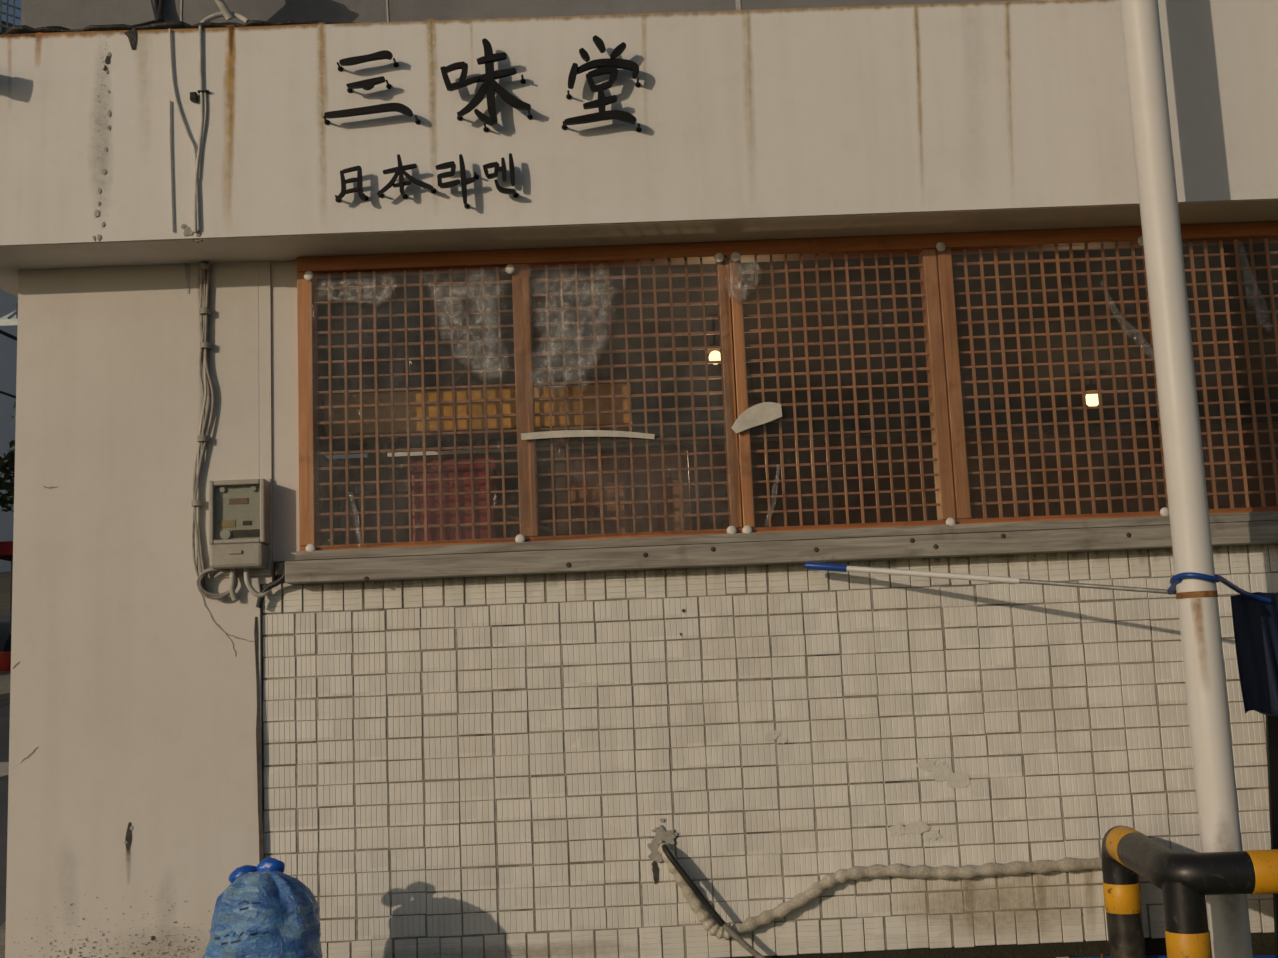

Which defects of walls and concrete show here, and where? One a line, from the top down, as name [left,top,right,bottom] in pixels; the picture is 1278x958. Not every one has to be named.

rust [0,0,1088,118]
leakage [31,897,210,958]